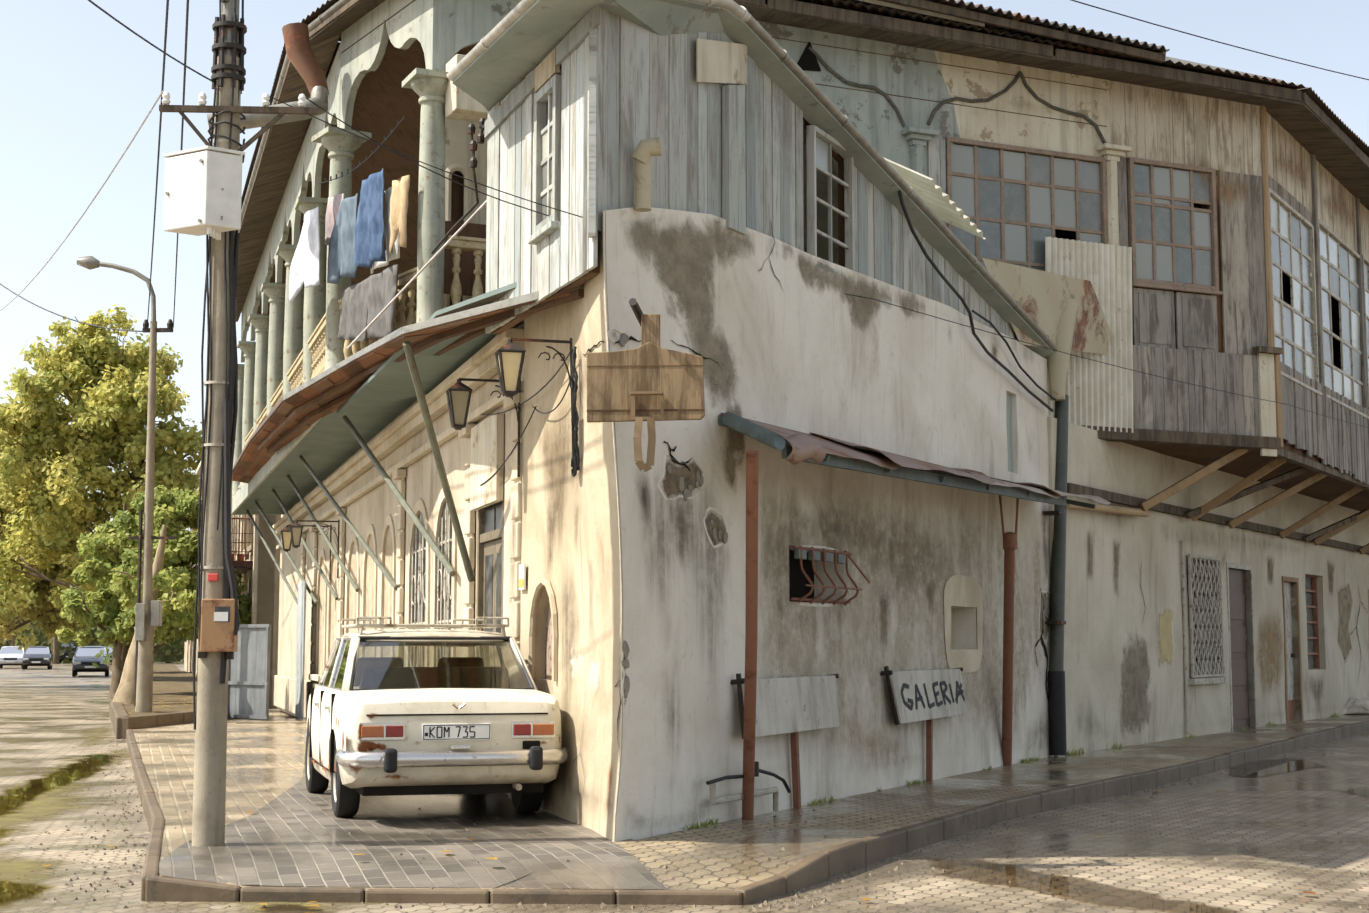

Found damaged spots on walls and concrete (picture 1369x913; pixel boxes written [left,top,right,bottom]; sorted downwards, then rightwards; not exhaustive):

peeling [631,221,750,485]
flaking render [657,453,728,549]
flaking render [1337,583,1369,664]
damp [1122,640,1150,730]